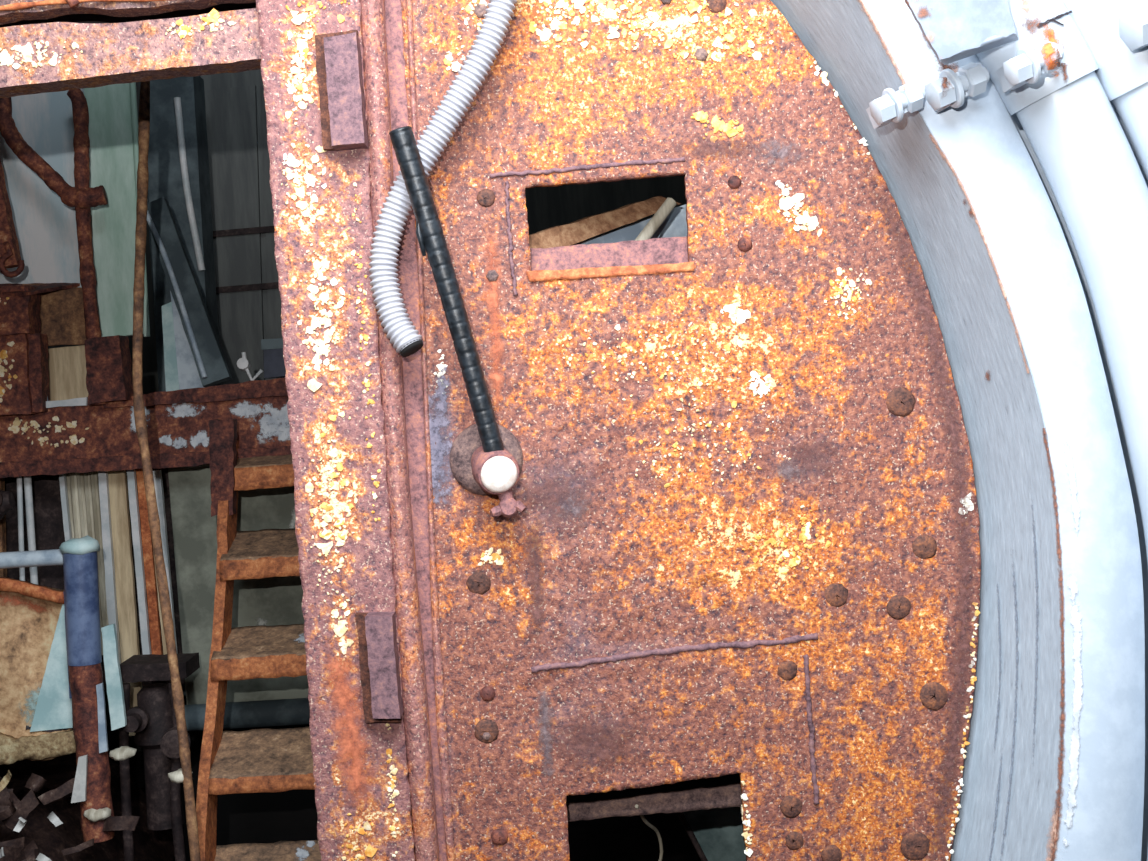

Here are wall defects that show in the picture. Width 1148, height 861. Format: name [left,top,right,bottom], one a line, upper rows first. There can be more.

corrosion [939,60,958,89]
corrosion [1023,18,1068,80]
corrosion [486,242,504,399]
corrosion [930,134,1029,373]
corrosion [885,206,975,858]